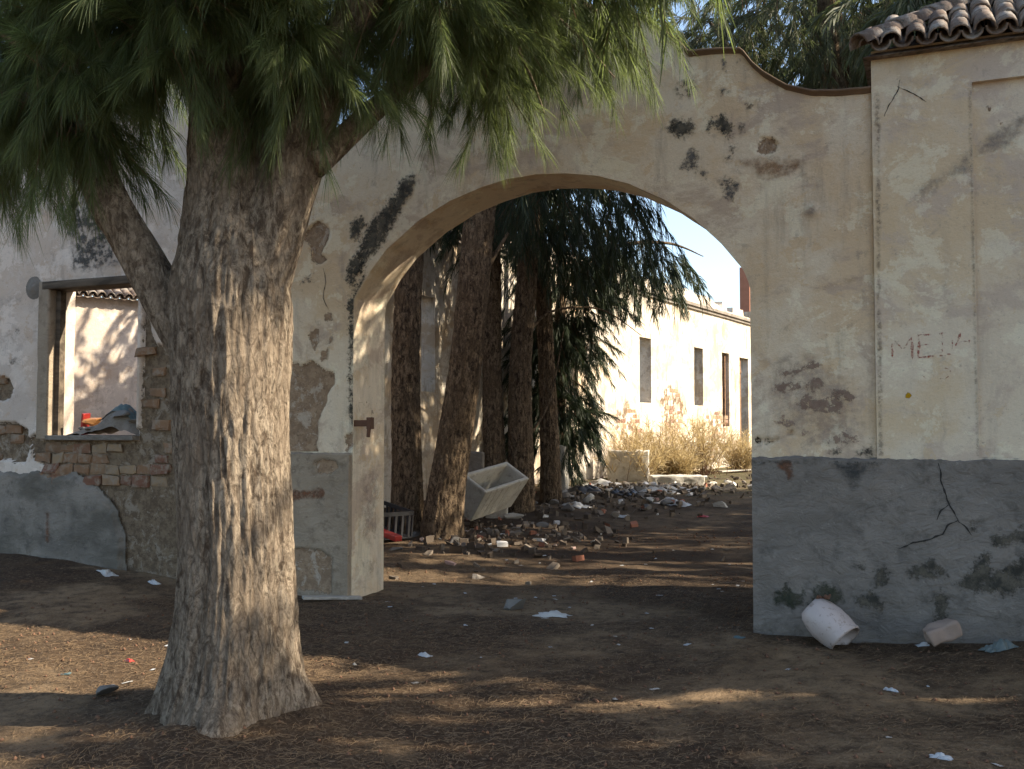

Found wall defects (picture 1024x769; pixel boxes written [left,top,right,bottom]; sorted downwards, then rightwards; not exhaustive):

water stain [667,114,744,176]
water stain [721,178,739,201]
flaking render [304,221,329,264]
water stain [344,174,415,424]
flaking render [0,314,177,579]
flaking render [289,360,335,452]
crack [899,463,971,549]
water stain [773,582,842,610]
water stain [856,566,891,611]
water stain [908,525,1024,622]